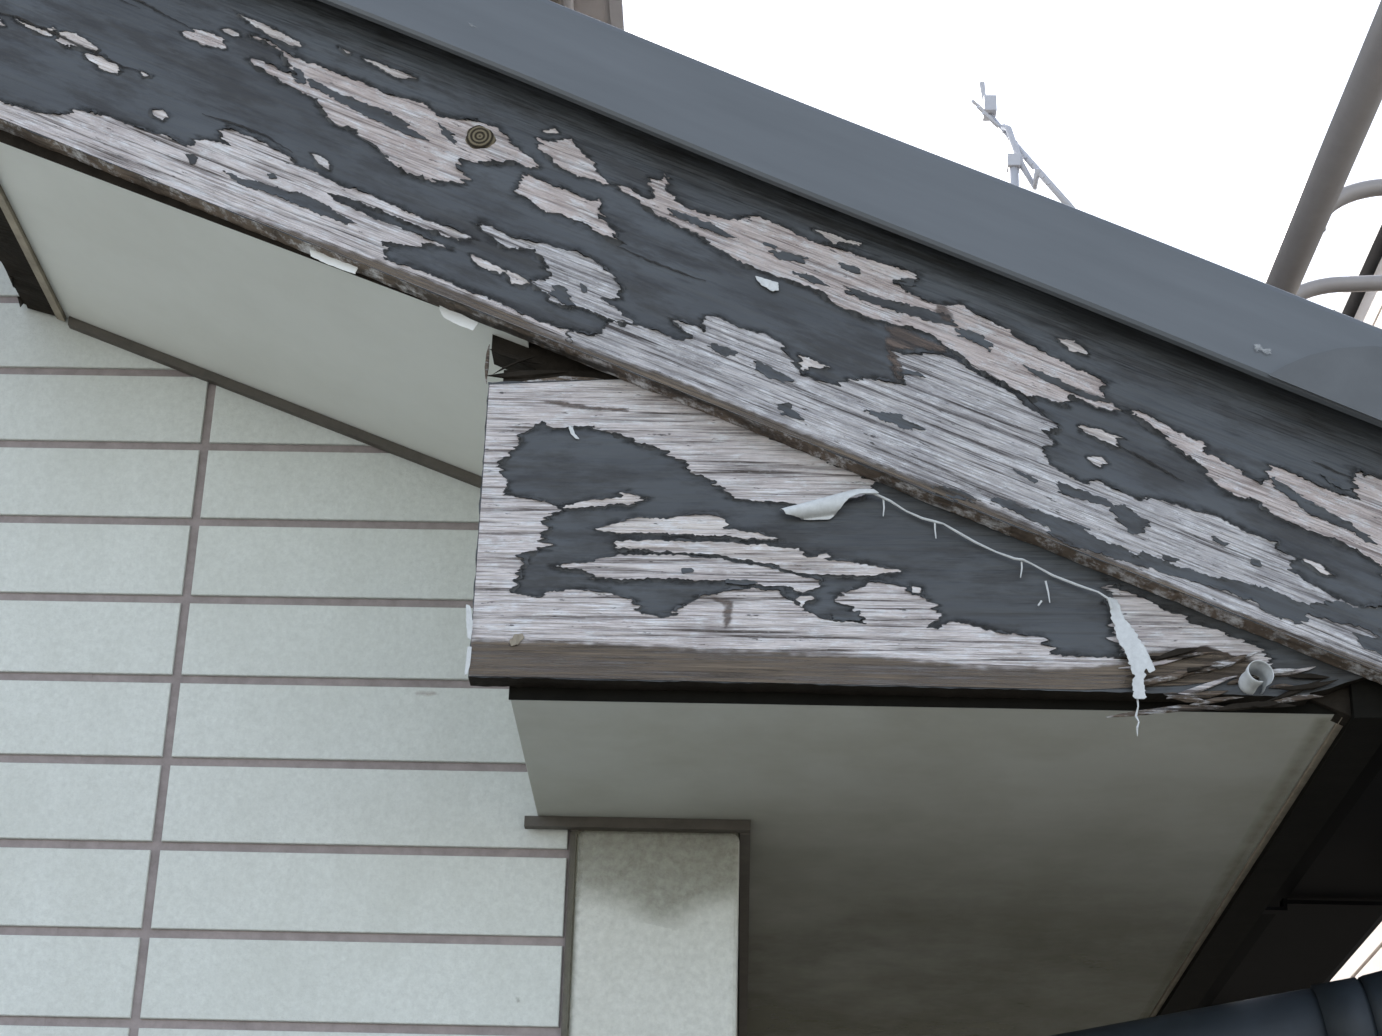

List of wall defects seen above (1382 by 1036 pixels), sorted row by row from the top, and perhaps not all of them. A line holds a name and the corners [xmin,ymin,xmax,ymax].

peeling [0,13,1382,736]